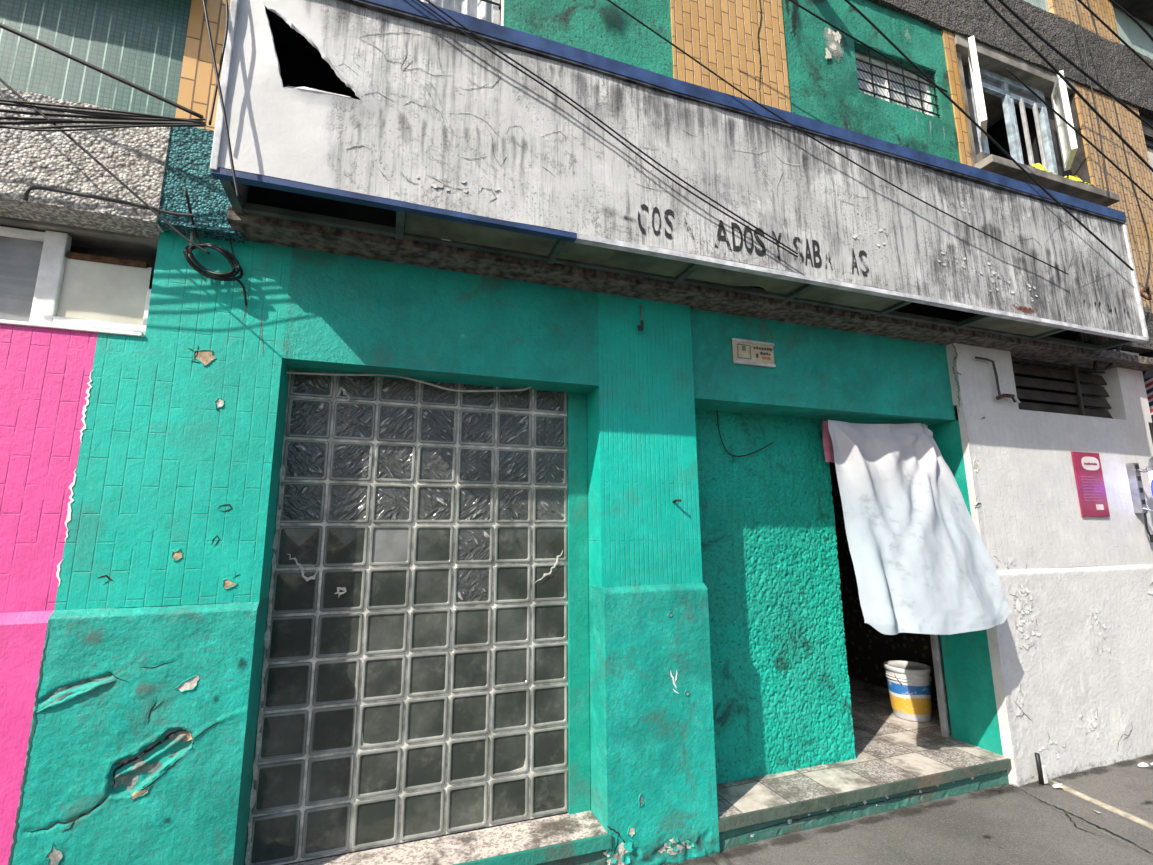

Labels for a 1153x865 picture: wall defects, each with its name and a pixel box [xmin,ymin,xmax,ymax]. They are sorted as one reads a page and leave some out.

crack [758,0,798,102]
peeling [825,28,842,59]
peeling [362,91,524,167]
peeling [1008,584,1041,716]
spalling [36,674,116,713]
spalling [175,675,200,693]
spalling [106,728,195,800]
crack [142,721,221,790]
crack [27,797,107,832]
peeling [603,826,635,865]
peeling [658,837,694,855]